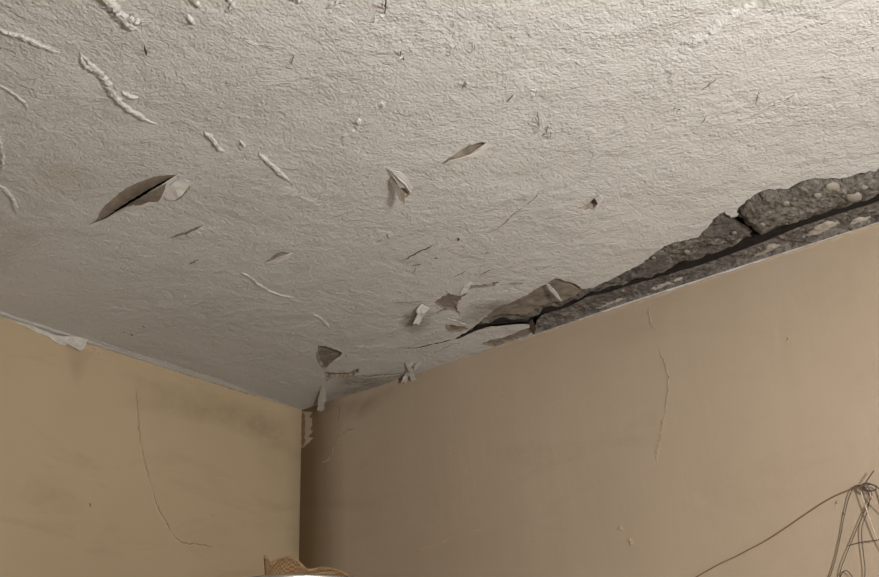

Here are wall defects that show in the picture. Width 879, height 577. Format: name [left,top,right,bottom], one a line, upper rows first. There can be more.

peeling [81,175,190,229]
peeling [386,169,413,204]
peeling [442,142,490,165]
spalling [413,169,879,367]
peeling [316,345,360,412]
crack [135,386,213,548]